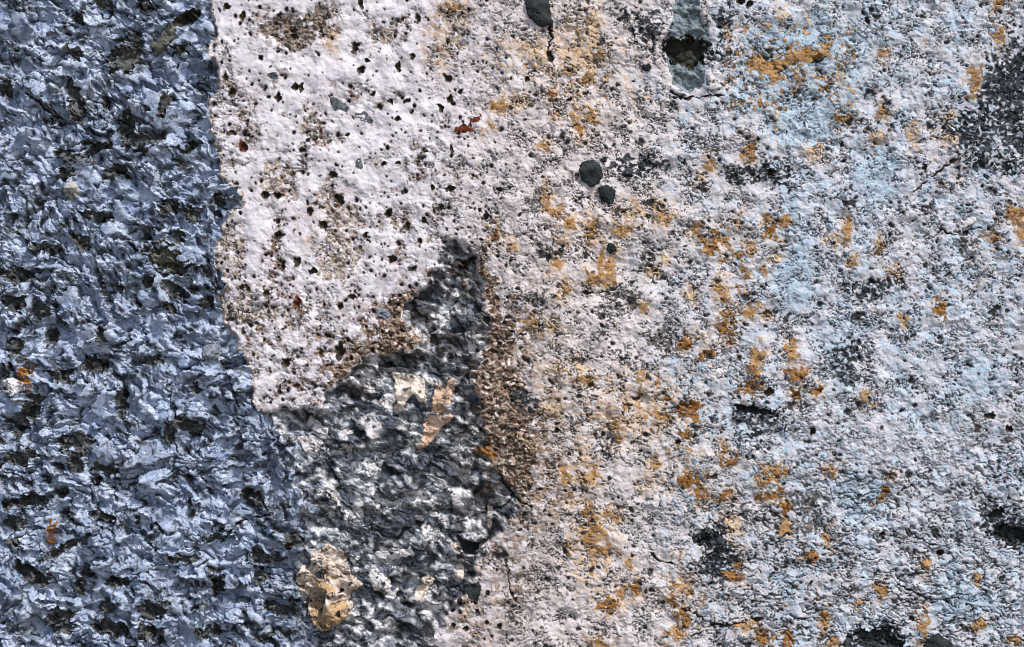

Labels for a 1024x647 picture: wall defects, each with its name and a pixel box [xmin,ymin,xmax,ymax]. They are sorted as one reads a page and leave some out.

spalling [206,0,537,647]